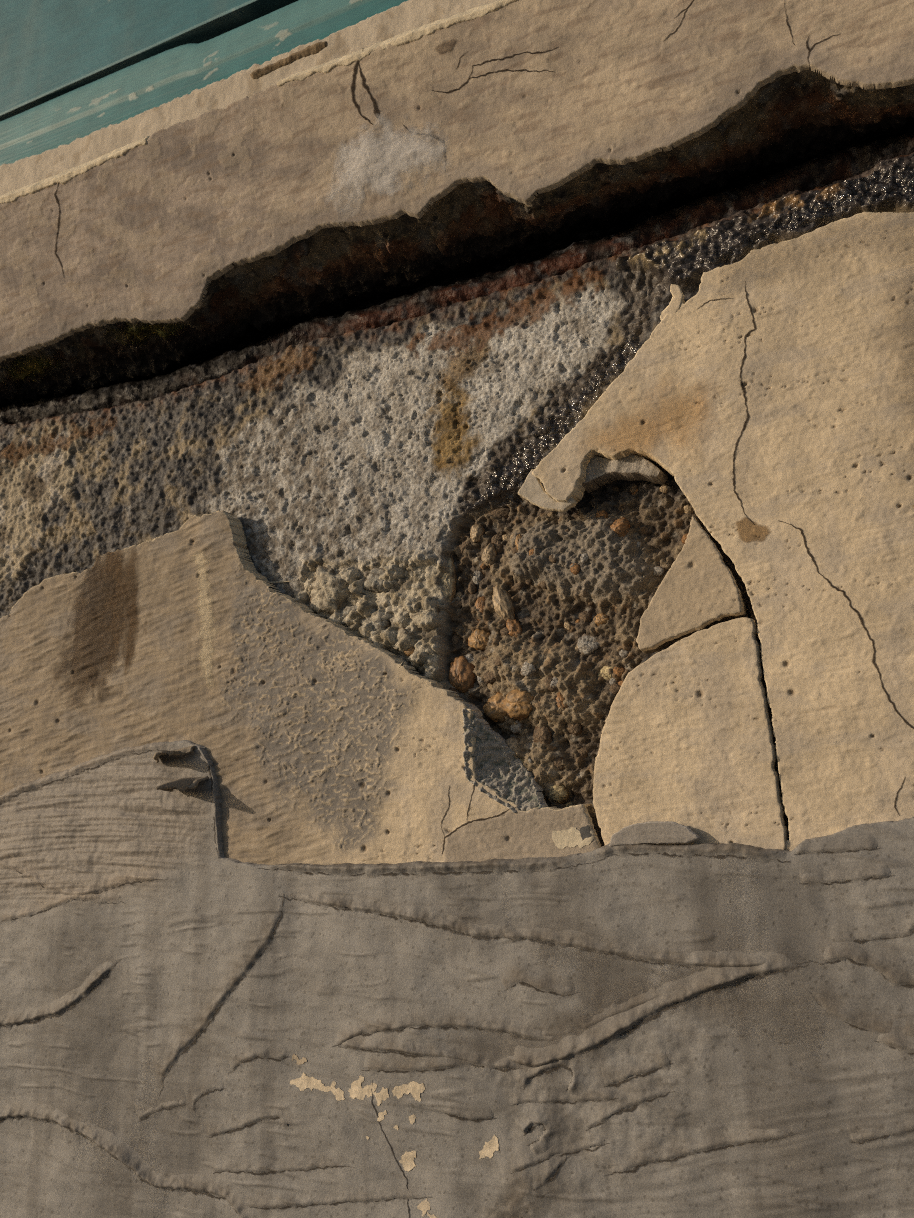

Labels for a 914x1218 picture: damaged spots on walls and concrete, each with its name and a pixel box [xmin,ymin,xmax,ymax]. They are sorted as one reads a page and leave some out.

crack [351,48,446,165]
crack [432,47,557,93]
spalling [0,67,914,407]
rust [238,345,318,392]
rust [406,267,602,469]
spalling [0,152,914,849]
crack [697,281,914,729]
crack [640,515,789,839]
crack [586,805,604,847]
peeling [290,1054,425,1130]
peeling [399,1150,416,1171]
peeling [479,1135,499,1159]